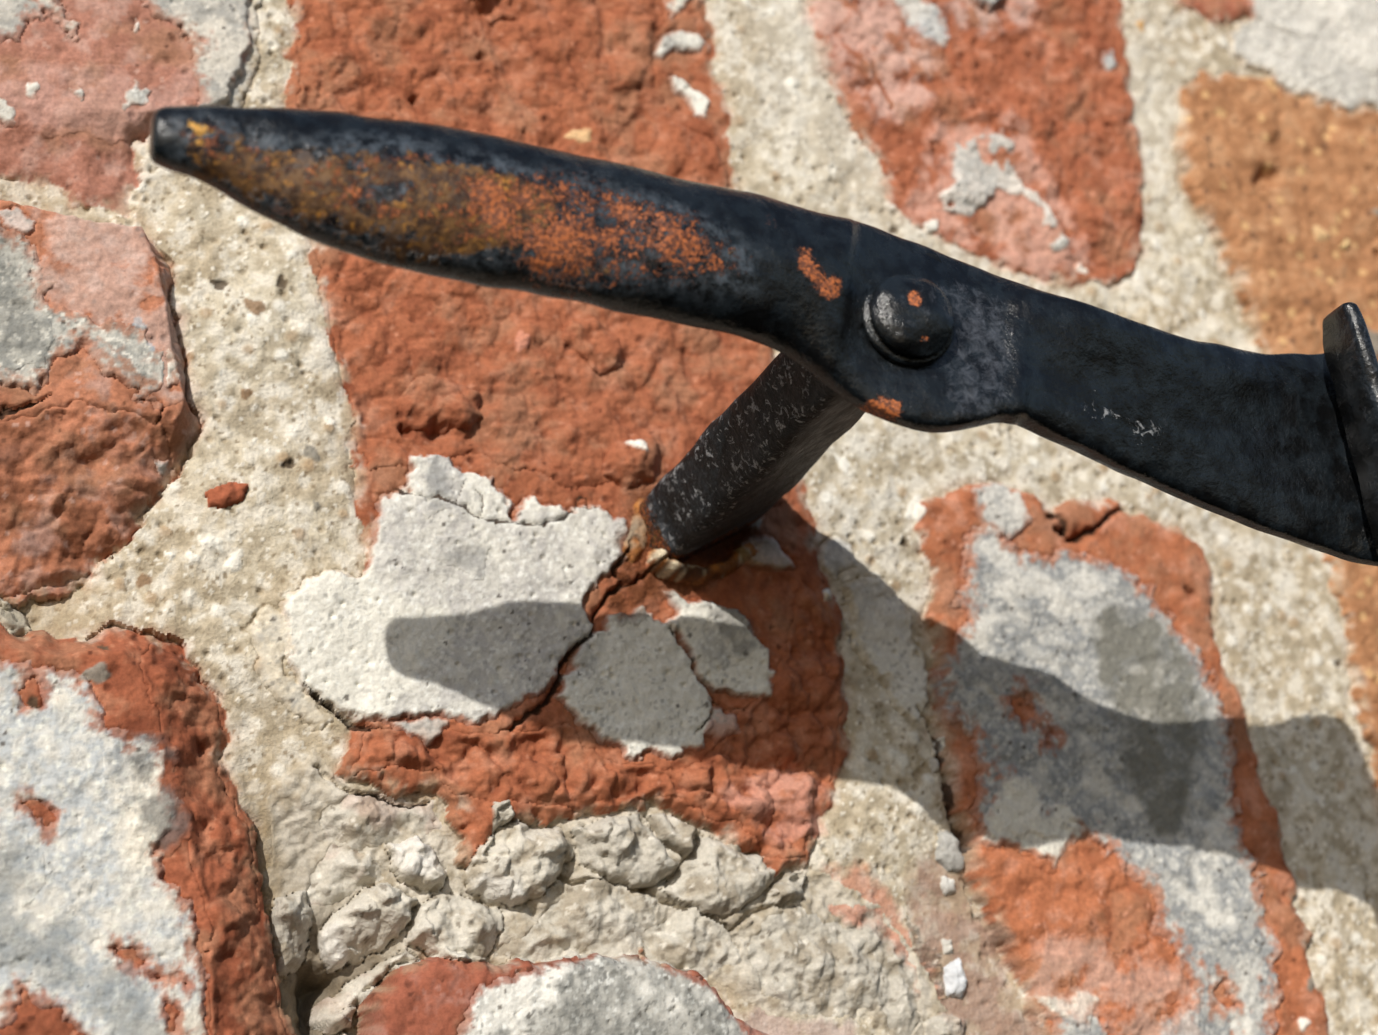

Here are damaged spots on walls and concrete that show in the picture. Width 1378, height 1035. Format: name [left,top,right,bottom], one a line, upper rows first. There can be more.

peeling [0,206,37,236]
spalling [291,0,729,188]
spalling [838,0,1138,269]
spalling [309,239,774,490]
spalling [0,400,177,599]
crack [499,546,669,733]
crack [342,787,430,809]
spalling [140,579,951,1035]
crack [646,820,715,917]
crack [916,706,974,918]
spalling [962,837,1176,971]
spalling [1107,992,1178,1031]